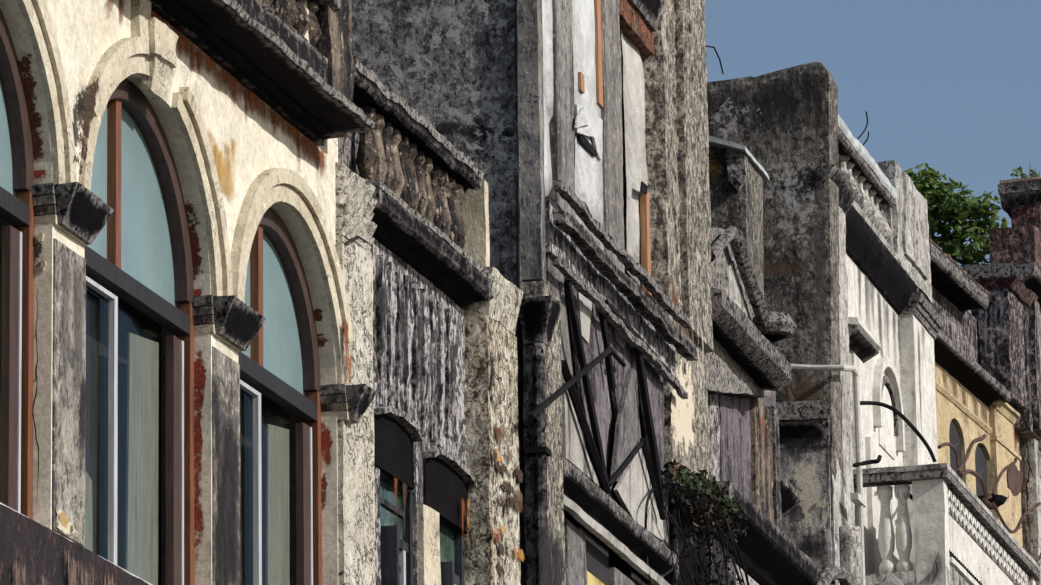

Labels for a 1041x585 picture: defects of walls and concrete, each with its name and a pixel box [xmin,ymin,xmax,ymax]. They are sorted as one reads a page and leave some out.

rust [151,9,326,177]
peeling [194,350,206,573]
damp [213,383,242,585]
peeling [321,422,333,511]
flaking render [793,454,828,531]
damp [13,561,26,585]
damp [66,550,116,585]